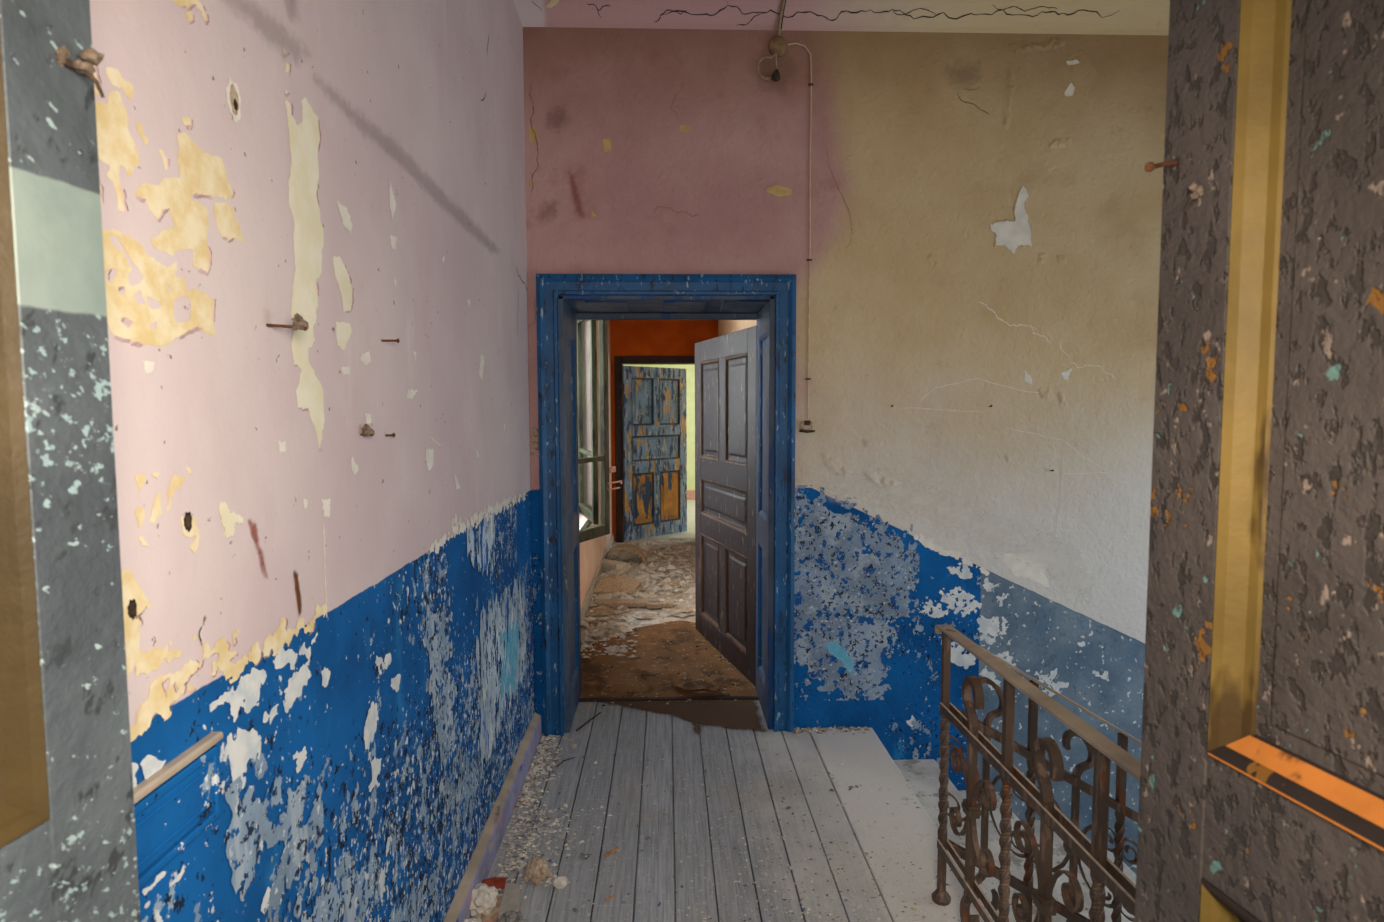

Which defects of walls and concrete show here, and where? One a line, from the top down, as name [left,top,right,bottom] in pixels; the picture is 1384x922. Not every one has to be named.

crack [656,5,1120,26]
peeling [93,65,245,375]
peeling [282,48,371,452]
flaking render [990,186,1032,254]
peeling [135,467,200,554]
peeling [430,490,527,576]
peeling [794,485,1050,701]
peeling [121,570,391,922]
peeling [375,653,401,692]
peeling [423,577,527,834]
peeling [1035,668,1069,697]
peeling [408,861,445,922]